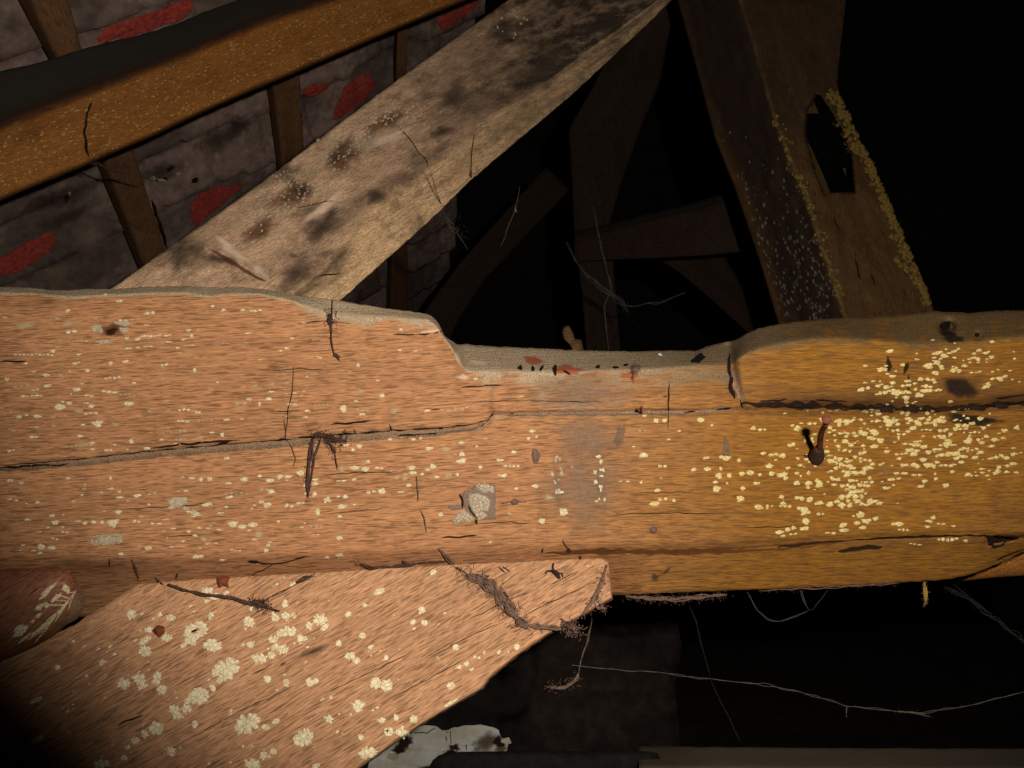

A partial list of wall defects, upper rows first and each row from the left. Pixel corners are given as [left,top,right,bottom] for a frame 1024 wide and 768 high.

crack [83,99,93,157]
leakage [224,105,446,239]
crack [0,354,1024,471]
crack [324,469,396,477]
crack [442,521,527,538]
crack [620,491,714,515]
crack [325,525,1024,703]
crack [195,686,293,736]